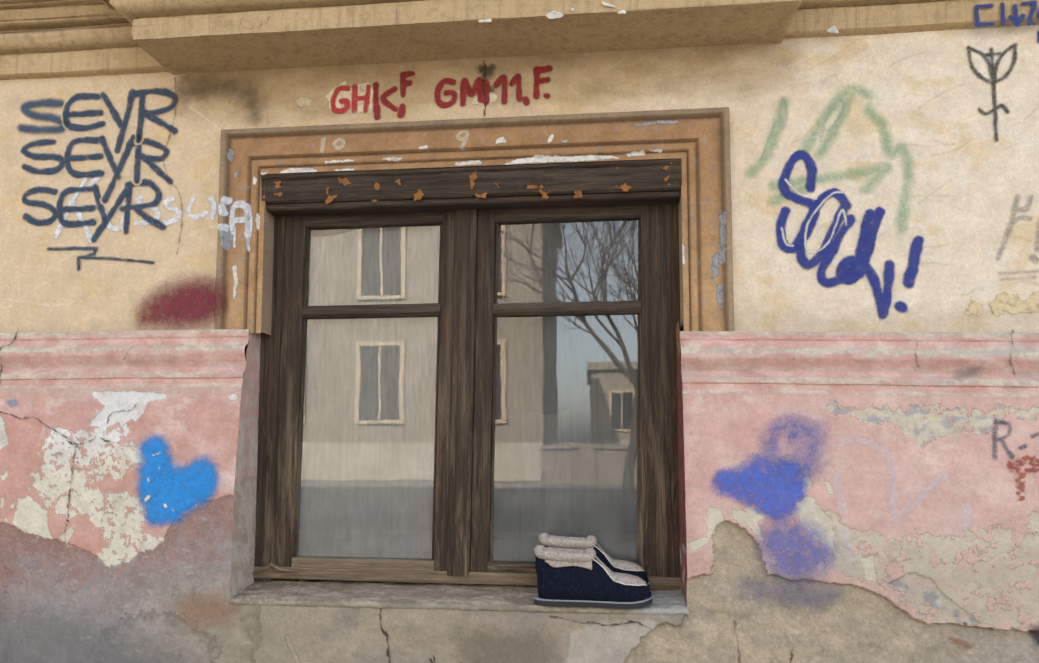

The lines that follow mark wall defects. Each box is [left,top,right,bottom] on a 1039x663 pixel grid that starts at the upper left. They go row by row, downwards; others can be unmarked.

peeling [964,291,1039,317]
crack [0,406,135,522]
peeling [825,401,1039,448]
spalling [0,390,262,663]
spalling [624,476,1039,663]
crack [379,615,391,663]